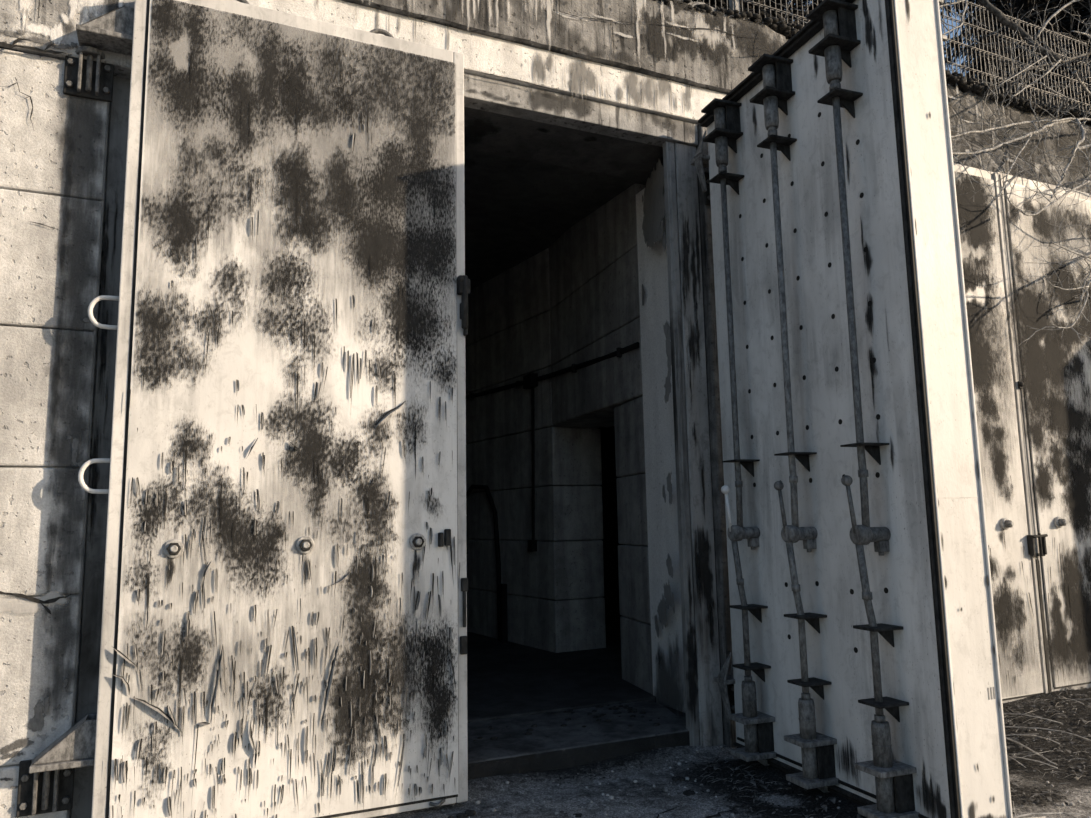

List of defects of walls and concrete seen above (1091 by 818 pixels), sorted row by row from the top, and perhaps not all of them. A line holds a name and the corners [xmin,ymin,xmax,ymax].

leakage [433,0,510,50]
leakage [525,0,785,133]
leakage [46,95,103,712]
crack [0,591,71,614]